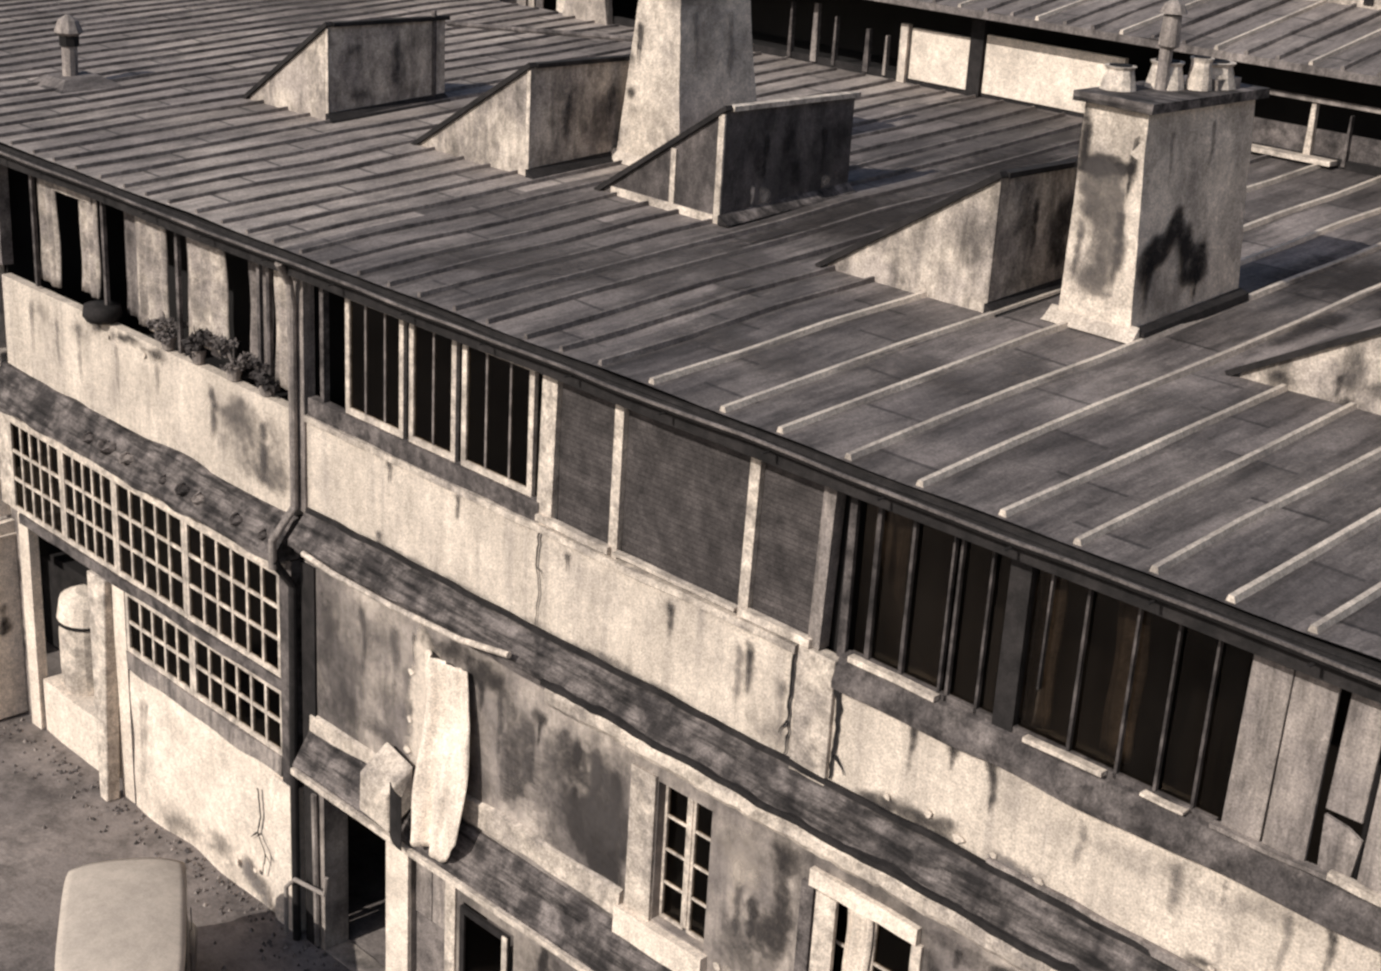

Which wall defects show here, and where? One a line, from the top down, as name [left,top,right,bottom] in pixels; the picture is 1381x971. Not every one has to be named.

damp [209,389,285,488]
damp [437,641,627,889]
crack [778,654,796,754]
crack [828,689,844,779]
damp [986,762,995,808]
damp [725,845,797,960]
damp [1328,931,1336,957]